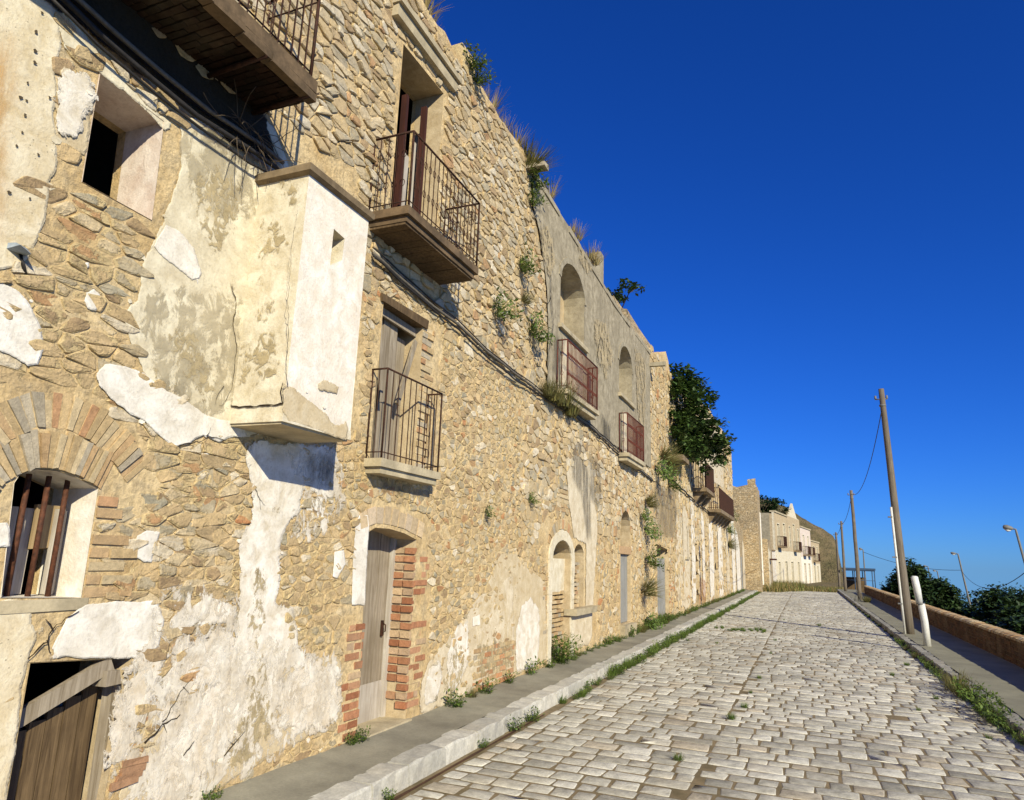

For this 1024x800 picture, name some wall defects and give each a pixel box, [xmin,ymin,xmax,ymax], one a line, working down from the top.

flaking render [0,0,348,800]
crack [179,214,297,446]
flaking render [352,515,369,605]
crack [144,684,189,744]